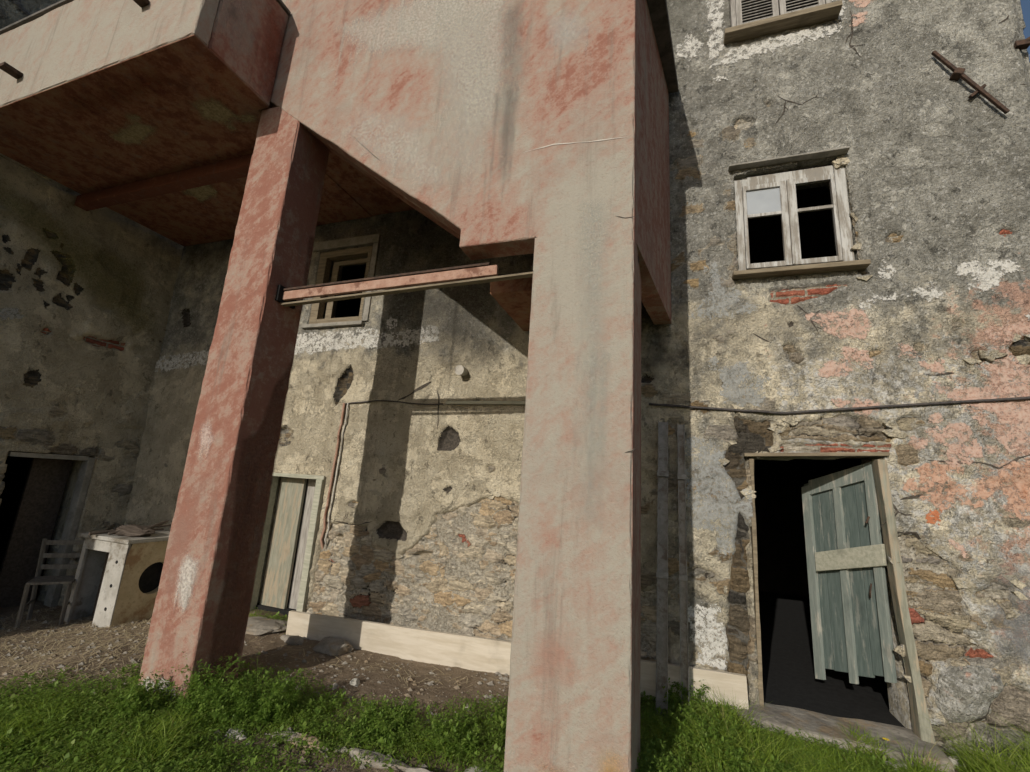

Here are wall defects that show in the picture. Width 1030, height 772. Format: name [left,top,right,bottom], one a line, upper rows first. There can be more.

peeling [675,0,871,83]
spalling [0,228,84,310]
peeling [955,259,1023,293]
peeling [294,316,439,355]
spalling [333,364,354,406]
peeling [685,314,1030,691]
spalling [887,535,1030,756]